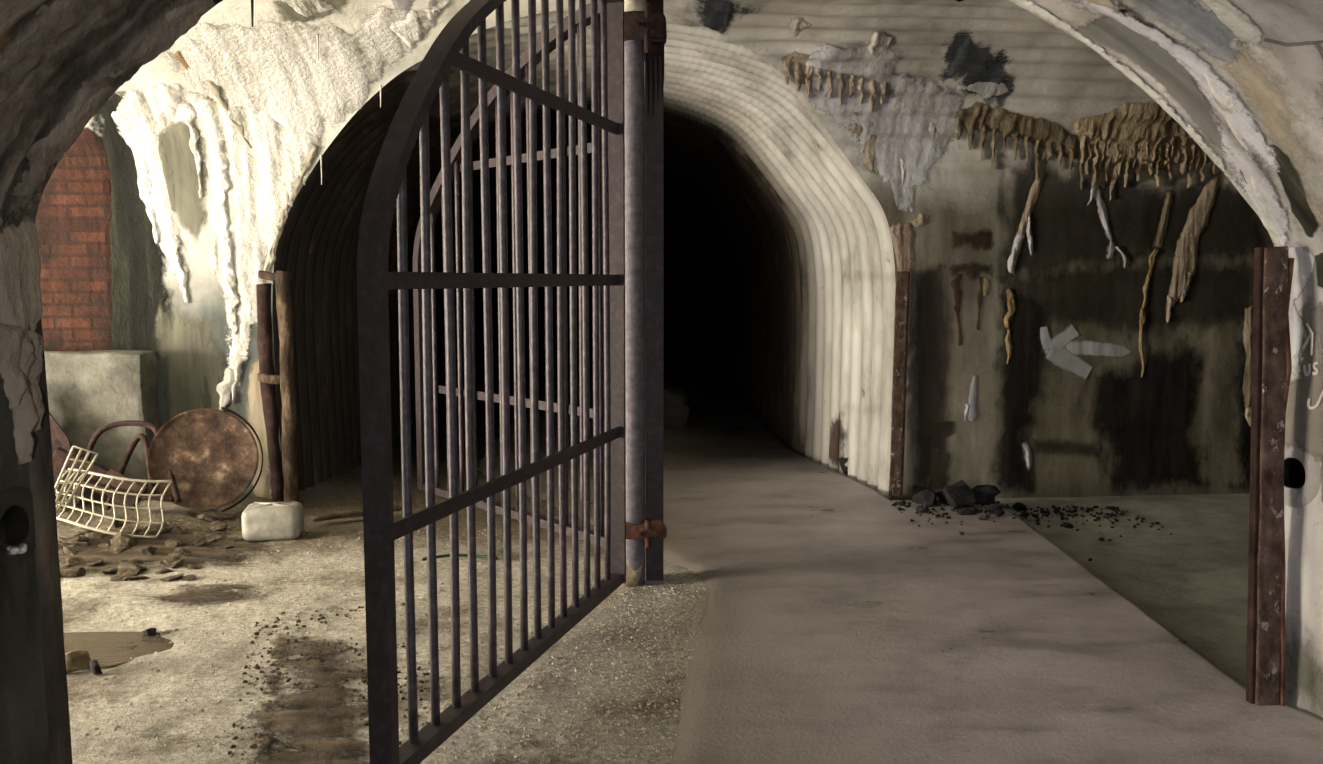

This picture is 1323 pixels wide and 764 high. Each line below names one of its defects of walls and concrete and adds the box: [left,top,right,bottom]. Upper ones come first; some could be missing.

peeling [274,0,346,22]
peeling [392,0,437,11]
water stain [806,32,1015,212]
peeling [1075,0,1263,152]
water stain [111,0,452,499]
water stain [911,269,977,489]
water stain [992,0,1320,494]
peeling [1284,244,1323,508]
water stain [1315,253,1323,349]